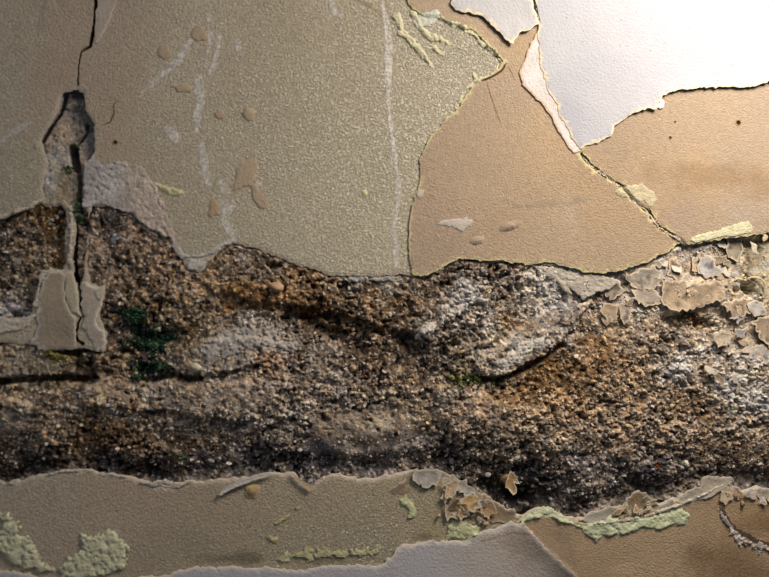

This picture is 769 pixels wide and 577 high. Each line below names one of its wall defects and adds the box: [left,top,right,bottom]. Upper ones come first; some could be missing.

crack [77,0,98,86]
peeling [407,0,769,276]
spalling [0,90,95,318]
crack [582,151,687,245]
crack [76,284,85,346]
spalling [0,154,769,577]
crack [718,507,769,555]